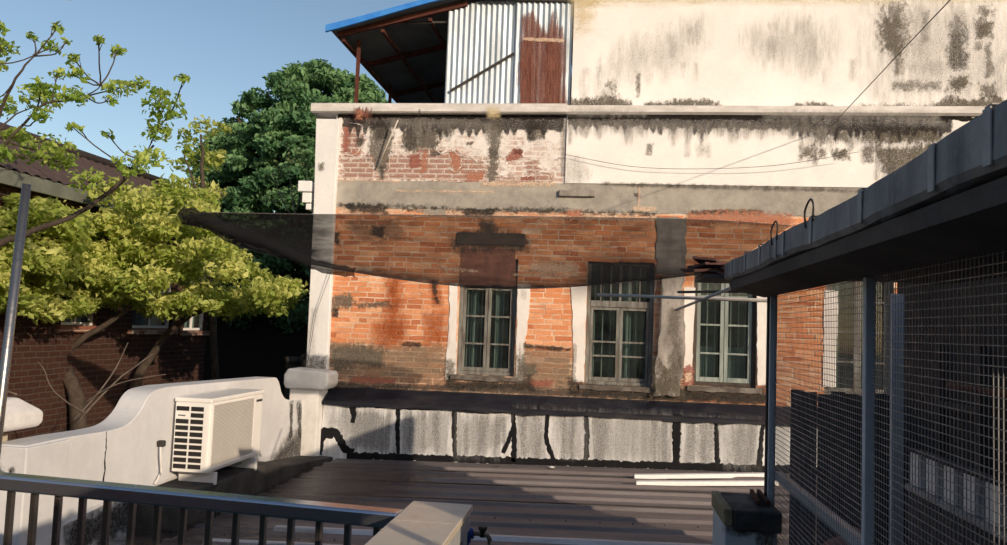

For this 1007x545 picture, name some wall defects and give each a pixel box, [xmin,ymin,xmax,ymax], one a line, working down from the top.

corrosion [518,10,567,104]
damp [338,0,1003,206]
flaking render [335,122,656,219]
damp [568,309,766,404]
crack [101,432,109,481]
crack [320,398,790,473]